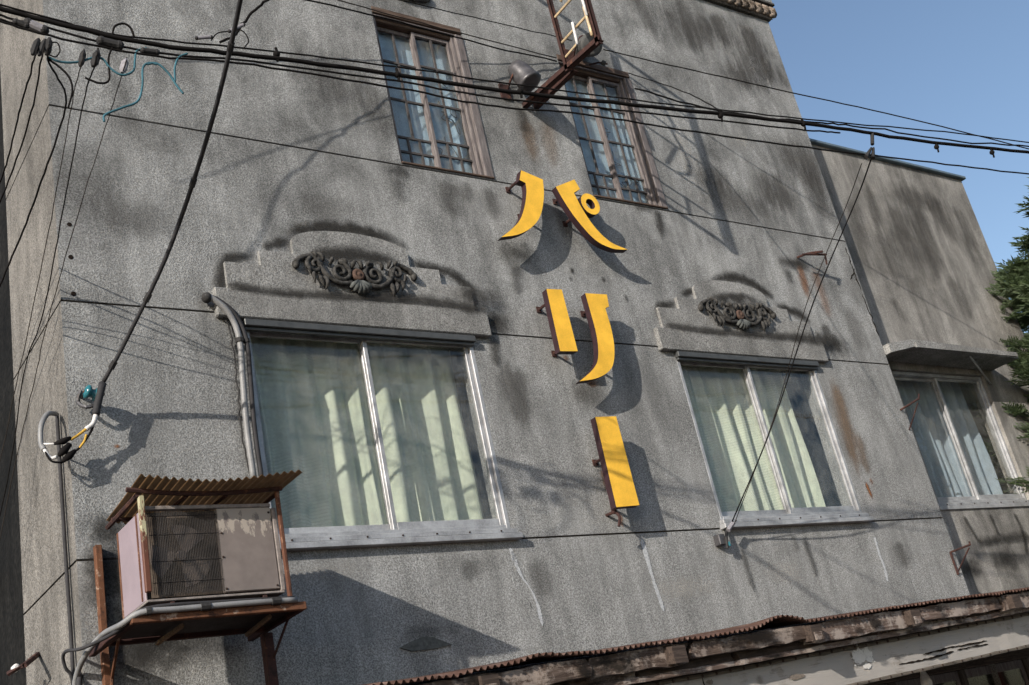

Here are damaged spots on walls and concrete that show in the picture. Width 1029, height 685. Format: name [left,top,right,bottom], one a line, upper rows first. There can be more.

rust [833,387,857,464]
peeling [851,644,876,669]